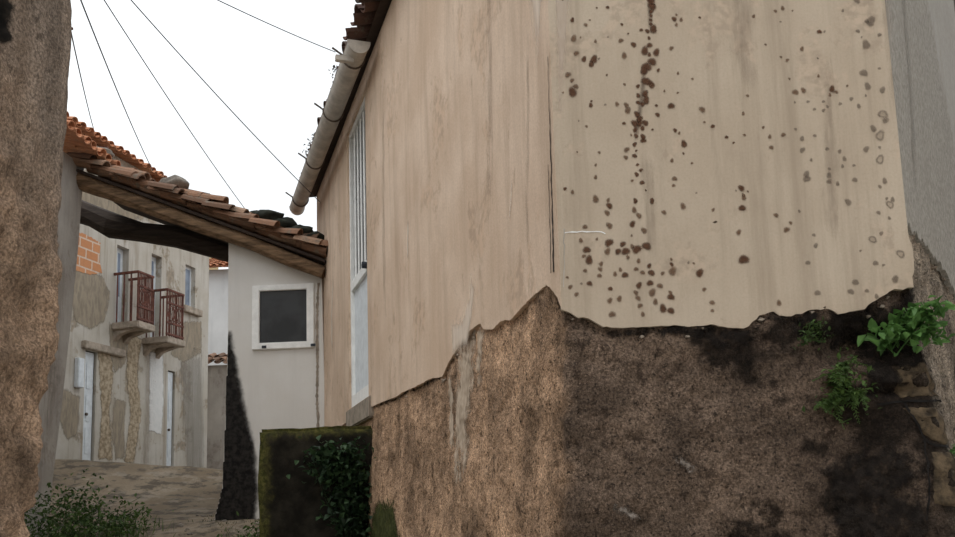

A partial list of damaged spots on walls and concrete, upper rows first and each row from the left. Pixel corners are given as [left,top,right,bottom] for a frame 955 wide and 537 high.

leakage [571,17,600,67]
leakage [788,70,885,112]
leakage [762,126,816,181]
leakage [566,195,676,317]
peeling [607,326,749,339]
peeling [798,310,818,324]
peeling [830,296,890,322]
spalling [892,362,955,507]
leakage [725,510,785,537]